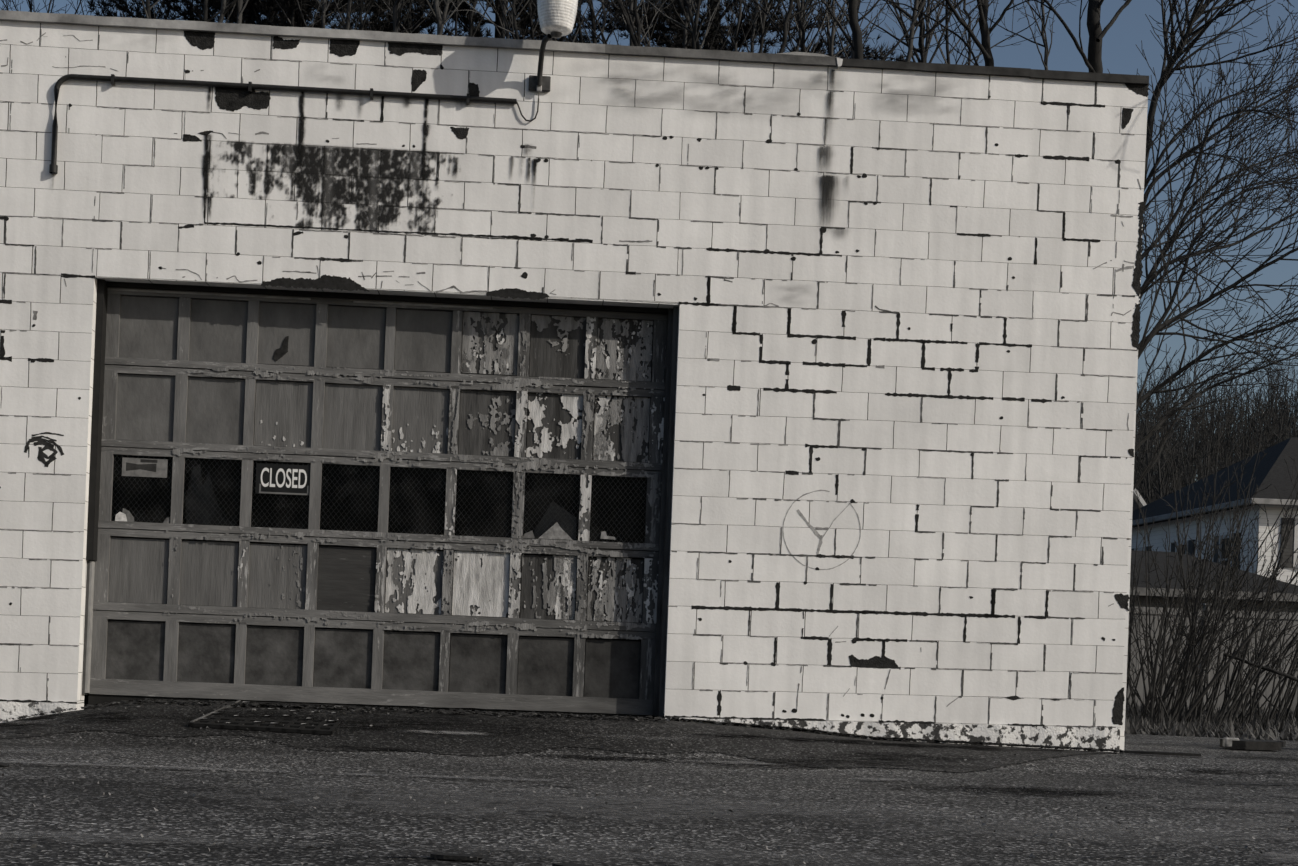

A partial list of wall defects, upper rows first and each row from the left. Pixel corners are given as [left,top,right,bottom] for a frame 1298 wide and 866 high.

peeling [184,31,215,50]
peeling [273,36,301,49]
peeling [329,39,360,57]
peeling [388,42,444,92]
peeling [215,87,271,112]
peeling [468,83,480,97]
leakage [820,70,835,219]
leakage [203,92,458,232]
peeling [164,272,665,640]
peeling [849,638,899,669]